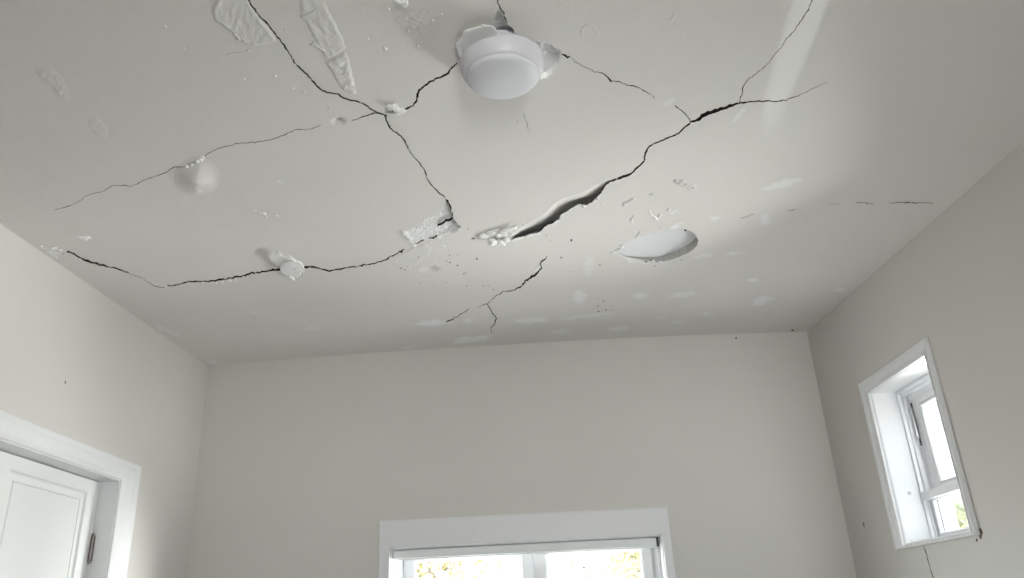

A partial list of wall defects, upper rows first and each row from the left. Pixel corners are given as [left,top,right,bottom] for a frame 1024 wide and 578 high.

flaking render [211,0,276,46]
crack [248,0,458,197]
crack [511,0,823,240]
crack [56,125,320,210]
flaking render [403,199,474,244]
crack [63,249,404,288]
crack [446,256,547,333]